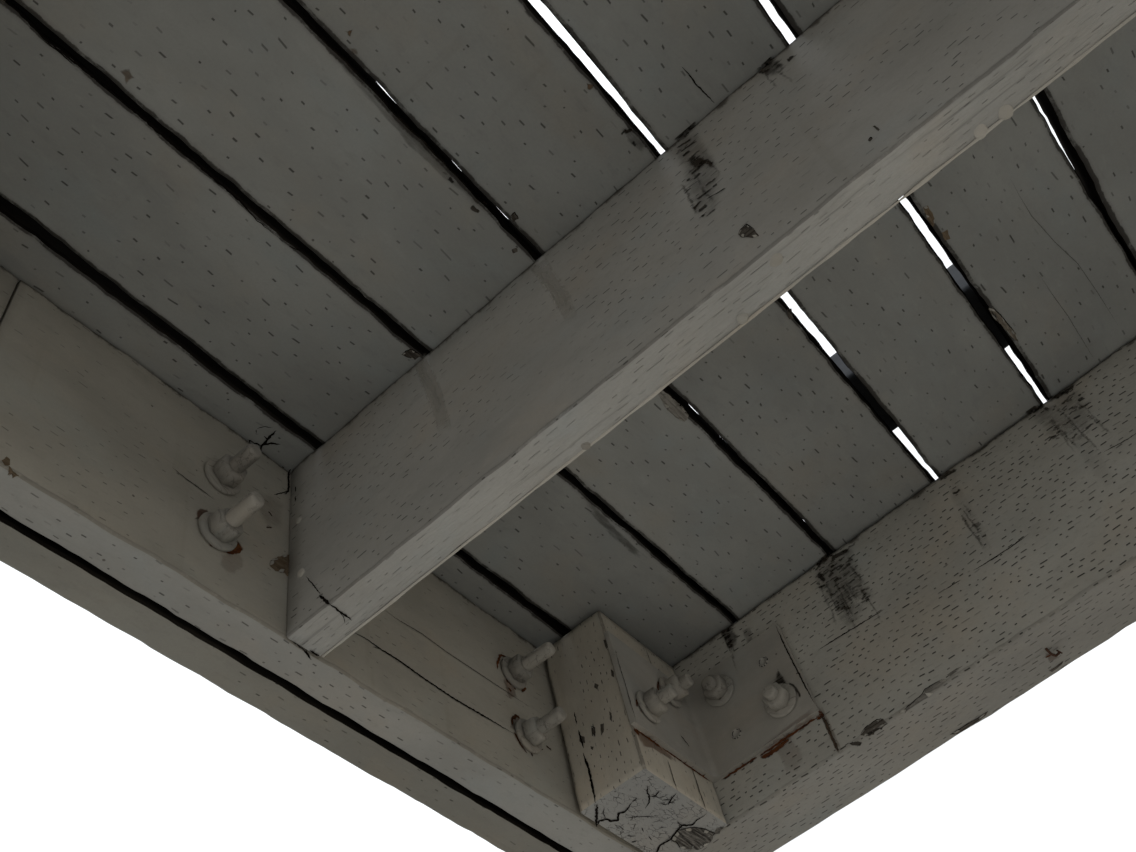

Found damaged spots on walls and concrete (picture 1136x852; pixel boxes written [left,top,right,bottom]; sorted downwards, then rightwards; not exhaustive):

damp [675,122,725,217]
damp [1026,385,1092,429]
crack [249,426,296,501]
damp [815,549,869,611]
crack [308,578,530,734]
crack [574,712,707,852]
corrosion [634,729,708,780]
corrosion [723,711,839,779]